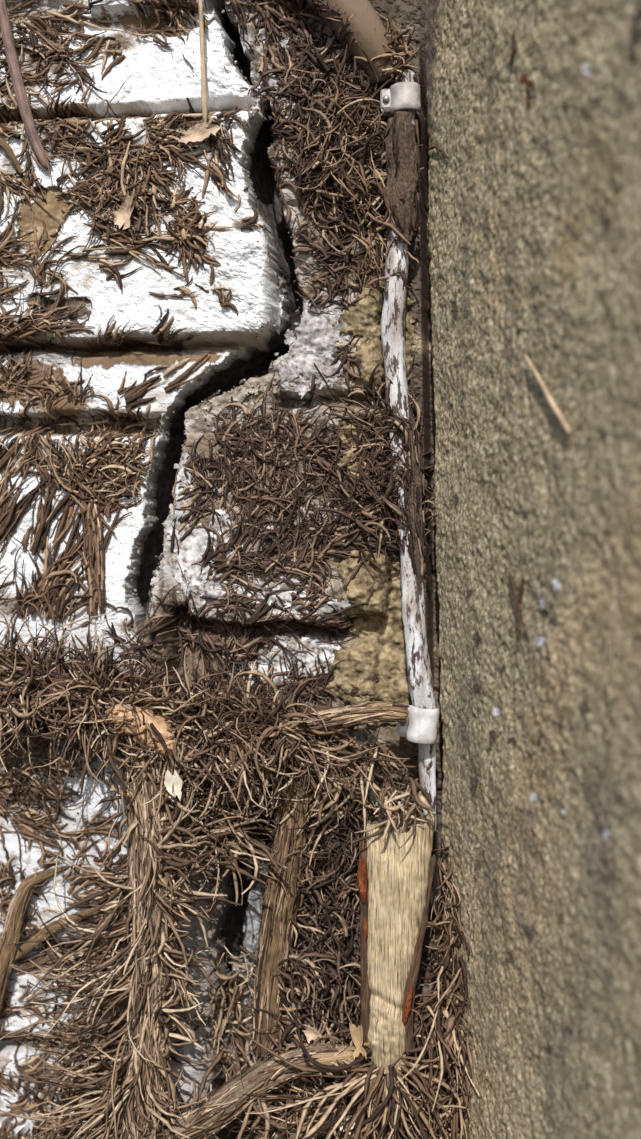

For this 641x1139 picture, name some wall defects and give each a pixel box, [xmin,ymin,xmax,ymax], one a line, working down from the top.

crack [122,6,303,625]
crack [214,781,279,1027]